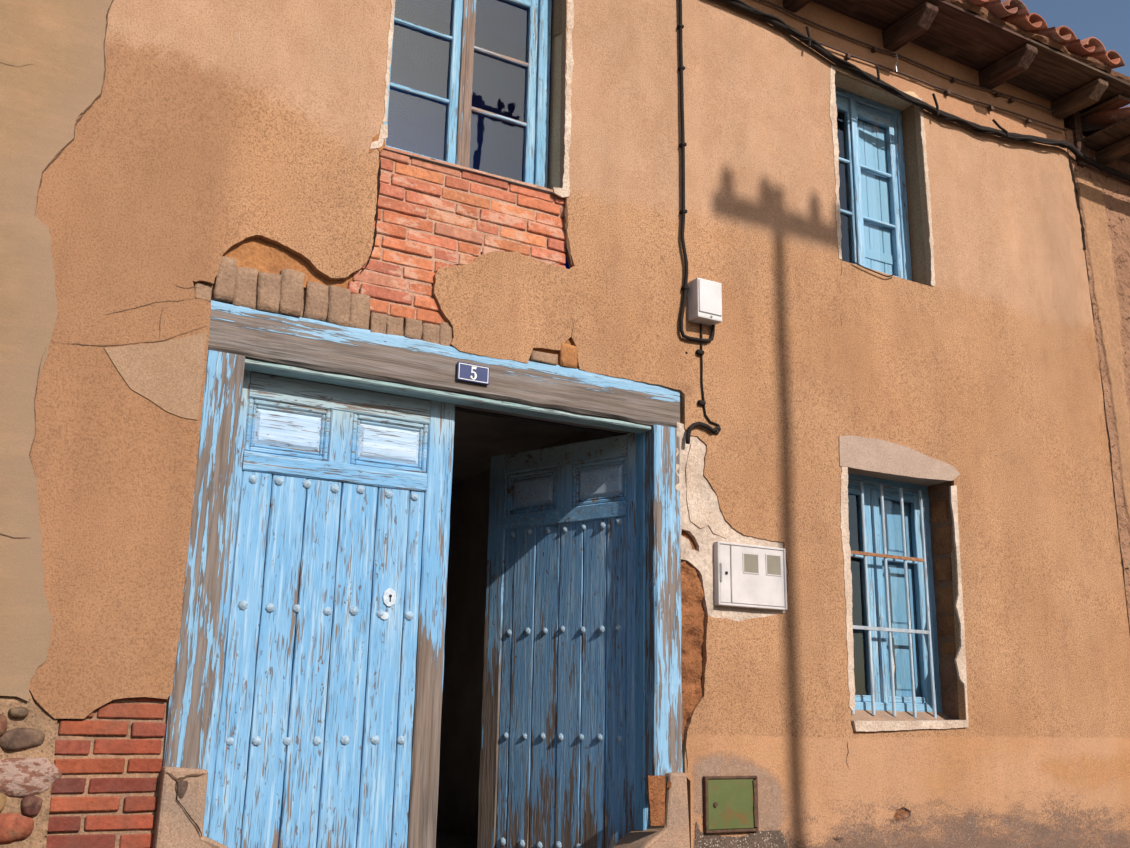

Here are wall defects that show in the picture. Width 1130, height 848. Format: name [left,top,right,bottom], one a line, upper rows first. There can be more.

flaking render [223,0,574,325]
crack [30,284,205,477]
flaking render [675,422,786,744]
flaking render [46,697,169,848]
spalling [175,777,188,799]
damp [696,756,1130,848]